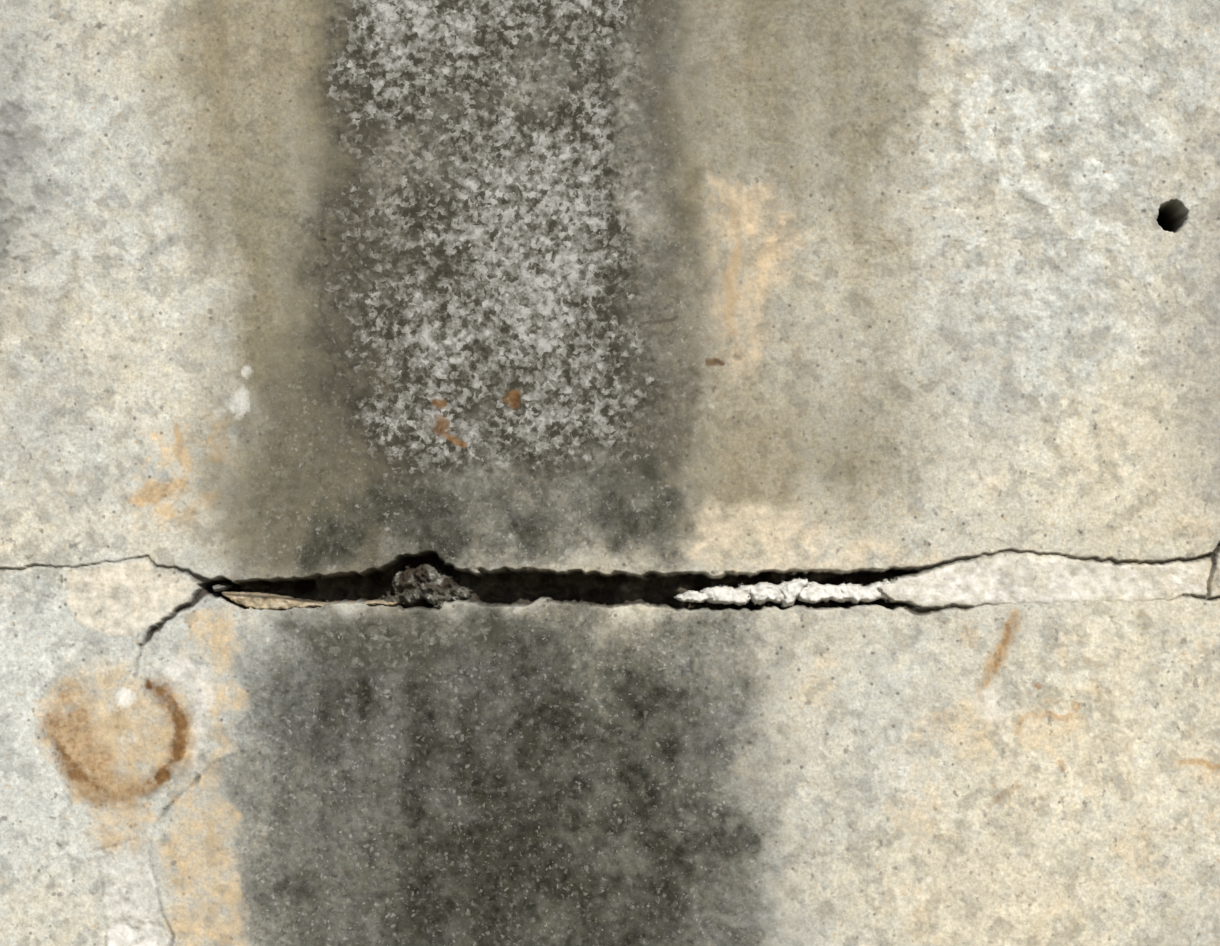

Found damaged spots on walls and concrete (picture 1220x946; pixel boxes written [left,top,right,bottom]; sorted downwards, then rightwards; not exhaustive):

water stain [119,0,987,579]
corrosion [35,602,255,946]
crack [83,741,274,946]
water stain [156,603,829,946]
crack [0,538,1220,684]